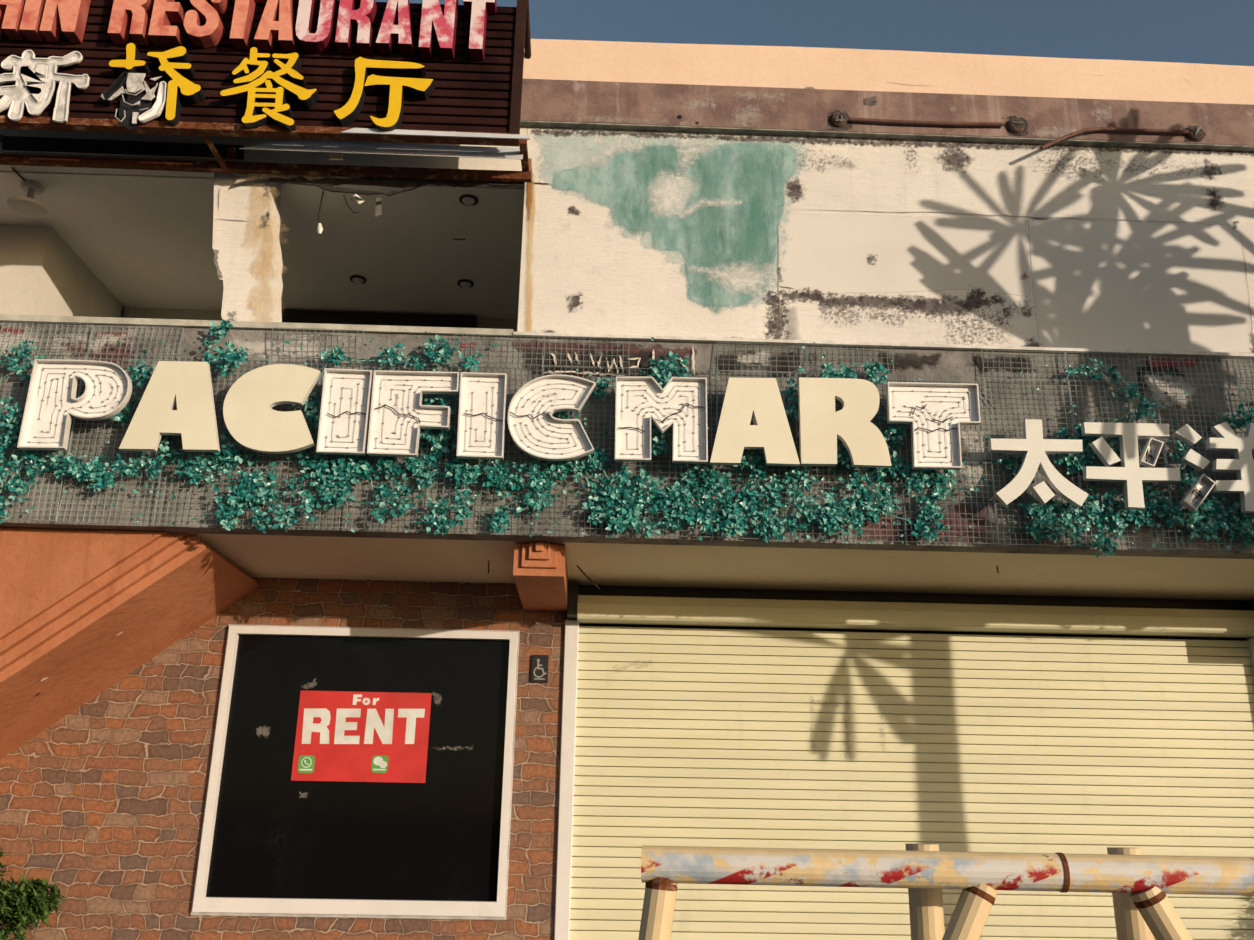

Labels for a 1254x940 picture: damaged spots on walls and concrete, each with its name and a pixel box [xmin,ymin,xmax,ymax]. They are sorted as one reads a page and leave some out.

leakage [532,128,1254,210]
peeling [535,129,807,311]
leakage [763,268,1031,345]